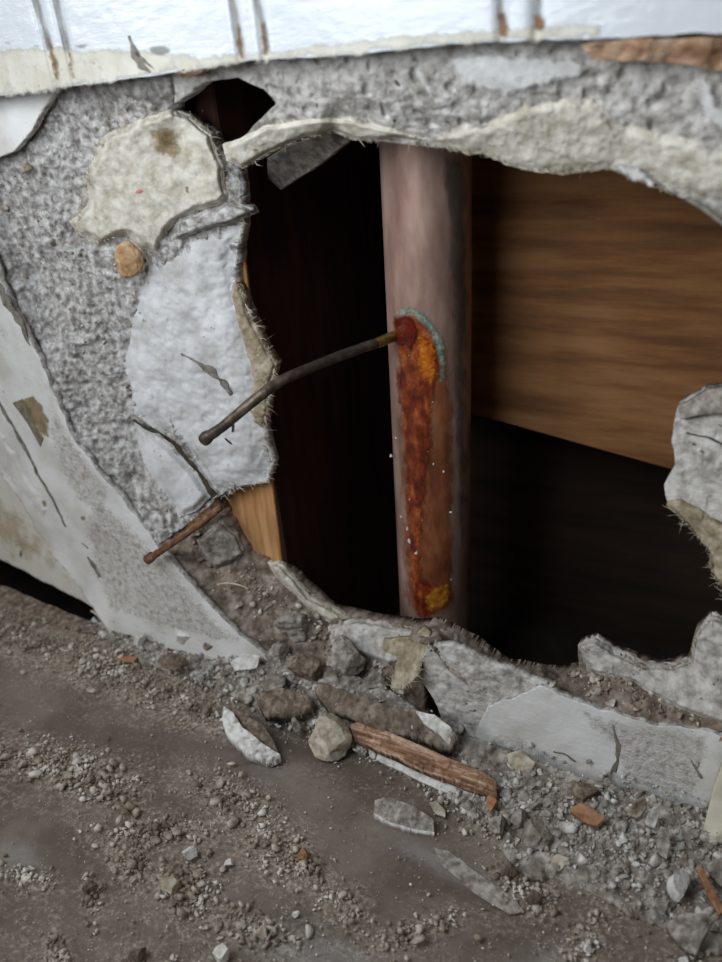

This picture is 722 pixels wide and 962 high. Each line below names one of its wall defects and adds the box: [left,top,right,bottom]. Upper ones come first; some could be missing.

crack [0,282,31,346]
flaking render [0,24,722,737]
crack [0,403,101,578]
rust [393,315,453,617]
crack [686,424,722,445]
flaking render [492,737,542,771]
flaking render [584,712,705,795]
flaking render [429,801,446,818]
peeling [626,796,670,860]